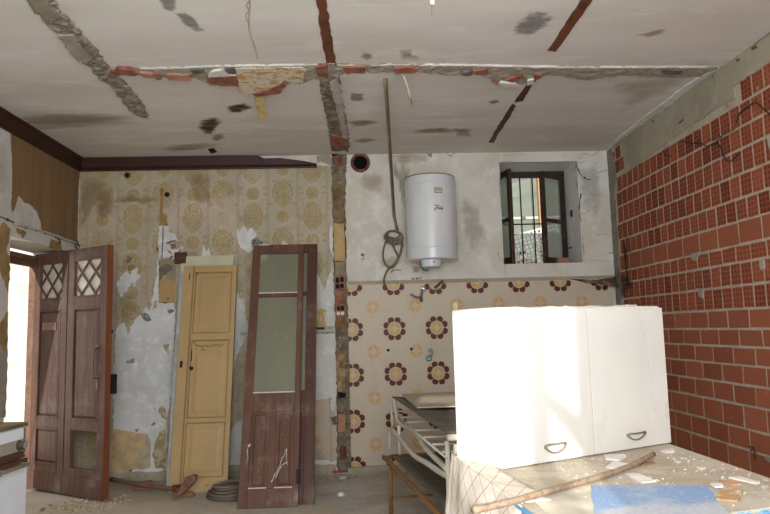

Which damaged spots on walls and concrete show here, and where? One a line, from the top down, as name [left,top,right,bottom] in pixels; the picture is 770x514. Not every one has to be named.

flaking render [208,68,236,78]
flaking render [498,78,534,87]